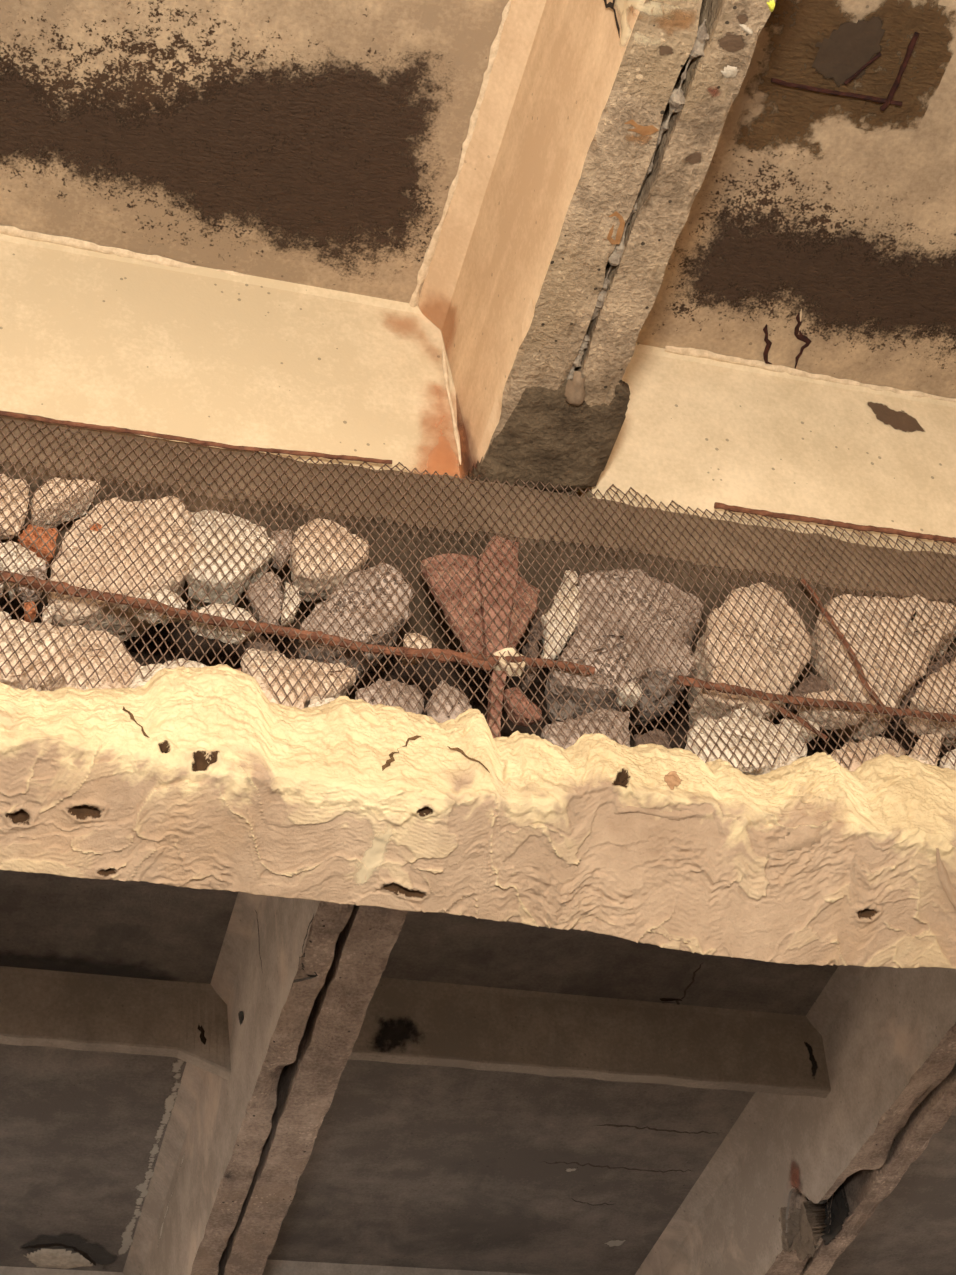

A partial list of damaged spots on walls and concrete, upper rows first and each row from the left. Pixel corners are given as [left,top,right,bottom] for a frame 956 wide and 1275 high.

water stain [0,226,198,269]
corrosion [421,415,477,477]
spalling [18,525,58,564]
crack [660,962,704,1005]
crack [197,1025,207,1045]
crack [597,1124,722,1134]
crack [543,1161,691,1206]
spalling [779,1183,850,1261]
spalling [21,1234,117,1269]